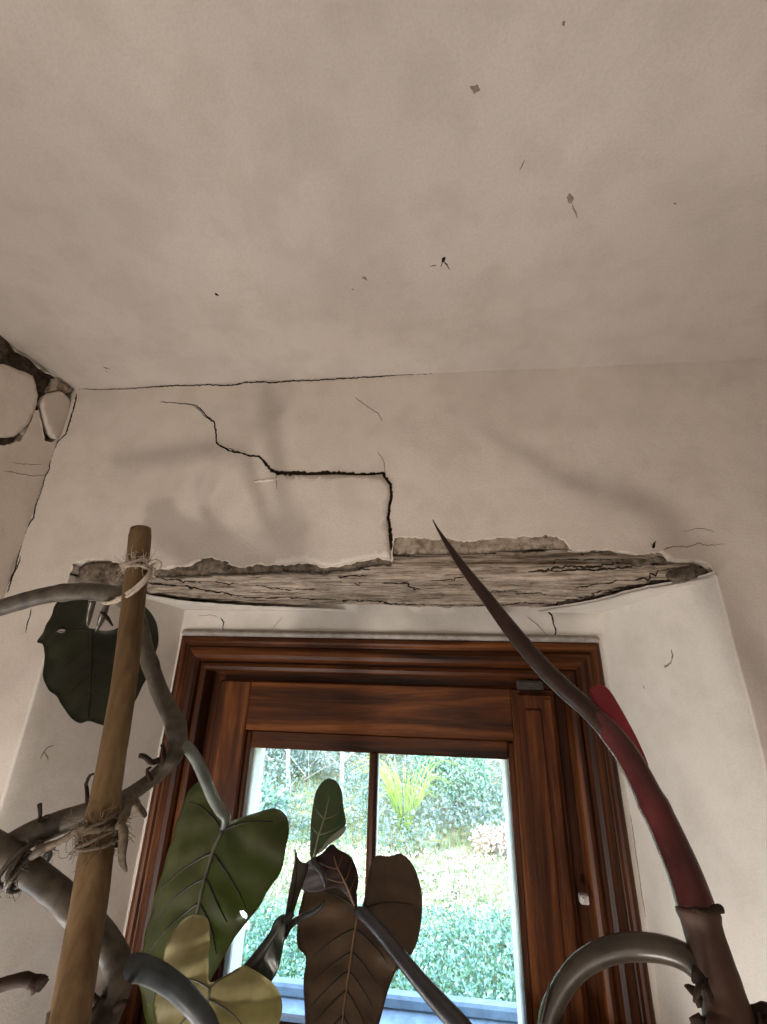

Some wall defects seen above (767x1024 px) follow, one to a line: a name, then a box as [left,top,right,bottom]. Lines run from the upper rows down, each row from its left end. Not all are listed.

flaking render [0,335,73,446]
crack [4,373,432,592]
flaking render [69,558,124,588]
flaking render [146,534,714,608]